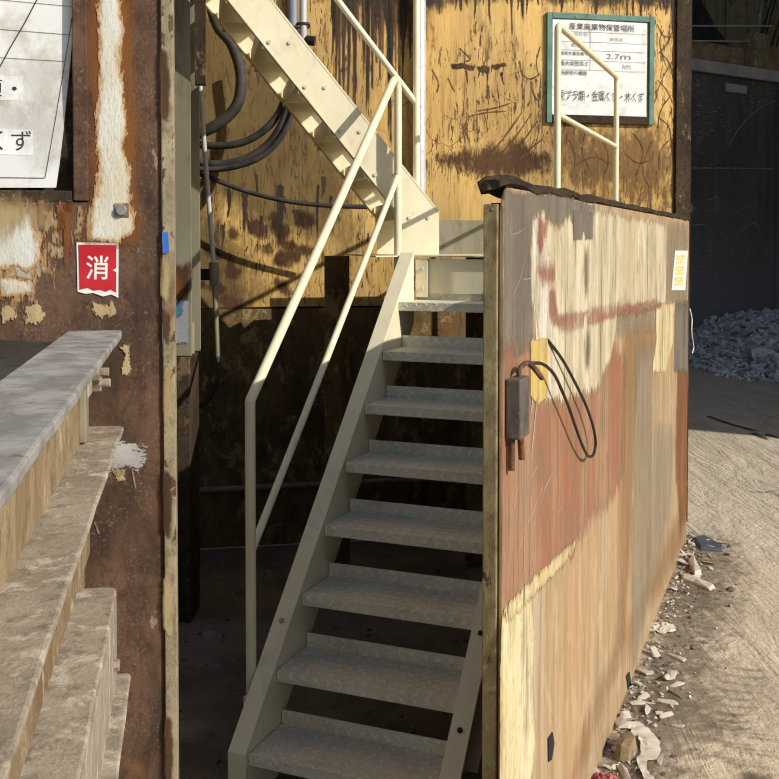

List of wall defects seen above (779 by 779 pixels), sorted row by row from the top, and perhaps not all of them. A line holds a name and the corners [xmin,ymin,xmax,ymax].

water stain [199,15,235,127]
water stain [200,52,280,160]
water stain [331,0,413,114]
water stain [426,0,496,22]
water stain [506,0,539,35]
water stain [550,0,676,37]
peeling [0,0,139,325]
water stain [200,118,344,310]
peeling [120,344,131,376]